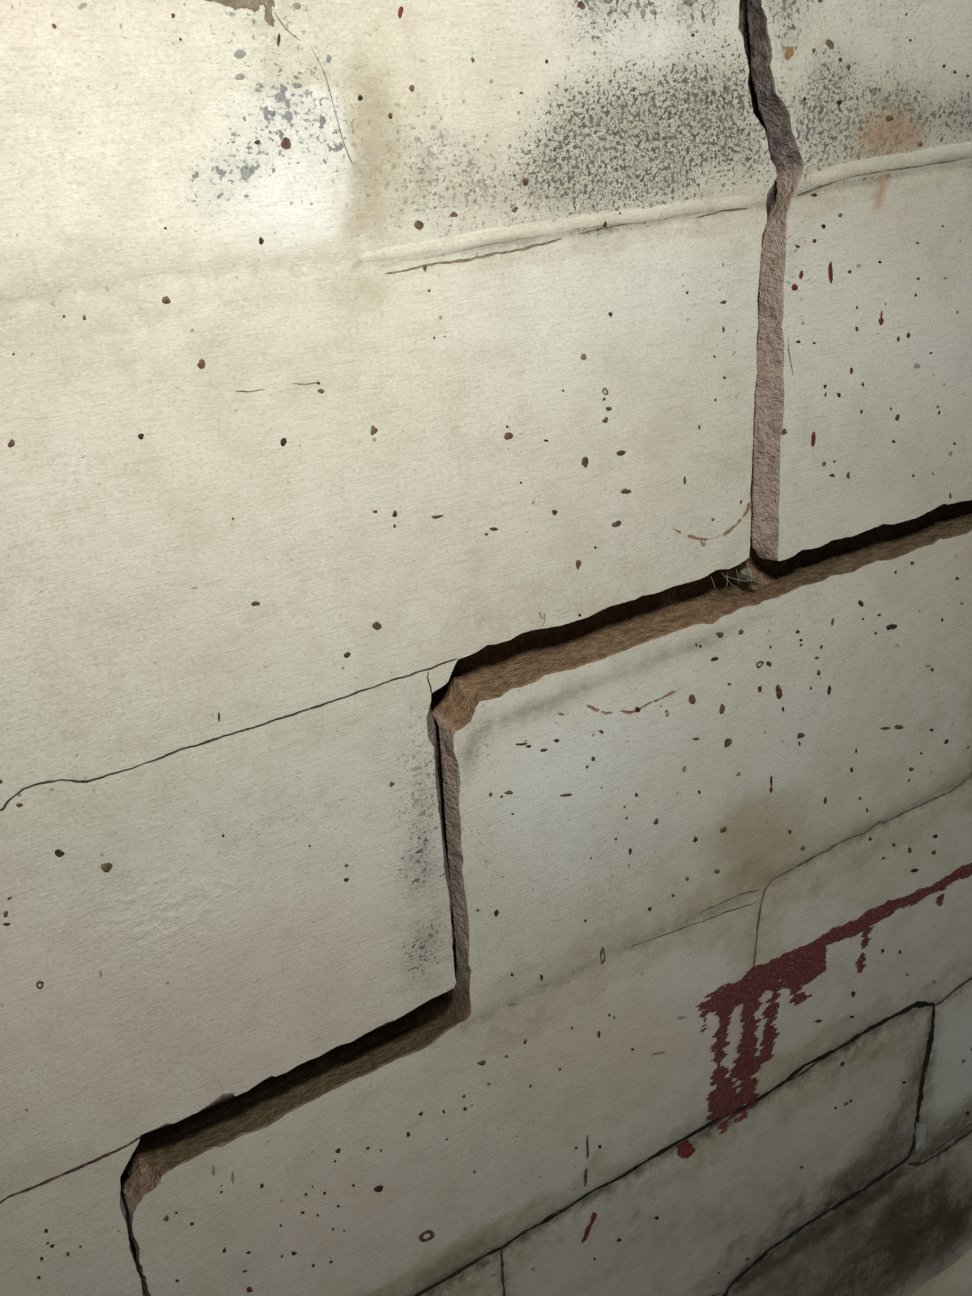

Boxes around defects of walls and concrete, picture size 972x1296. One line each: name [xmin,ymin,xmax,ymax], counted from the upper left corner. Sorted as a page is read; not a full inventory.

crack [274,12,353,164]
mould [509,0,777,234]
mould [762,0,814,62]
mould [779,47,972,191]
crack [385,223,631,274]
crack [431,0,972,732]
crack [0,658,457,811]
crack [632,772,972,966]
crack [120,703,471,1296]
crack [0,1136,141,1204]
crack [414,977,972,1296]
leakage [740,1115,972,1296]